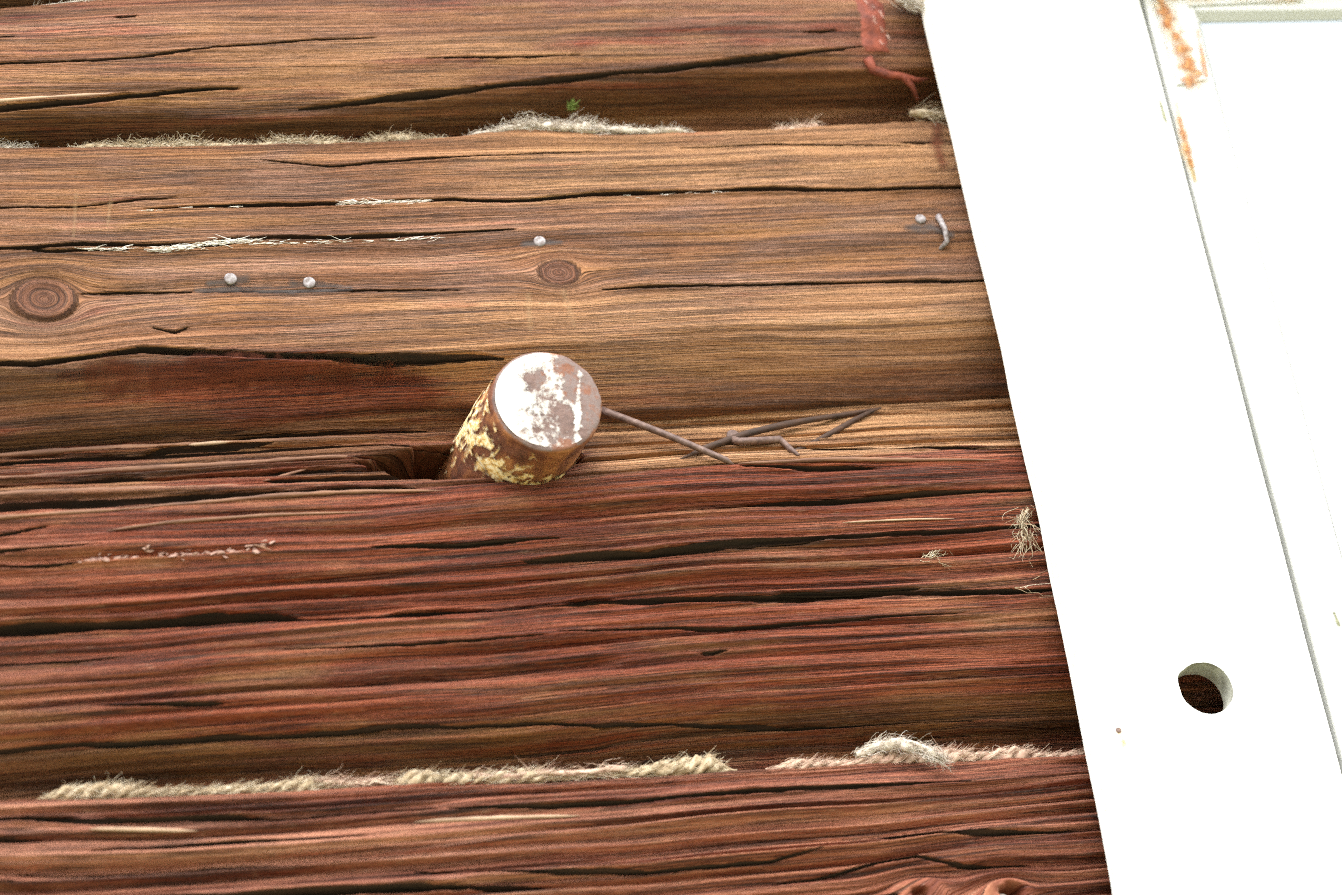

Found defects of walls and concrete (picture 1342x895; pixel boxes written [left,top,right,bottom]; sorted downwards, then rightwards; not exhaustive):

corrosion [1158,0,1208,86]
crack [0,87,238,113]
crack [265,152,581,168]
crack [698,141,934,149]
corrosion [1179,118,1195,178]
crack [0,186,962,253]
crack [82,288,458,296]
crack [602,280,985,290]
crack [0,327,504,368]
crack [0,588,1052,666]